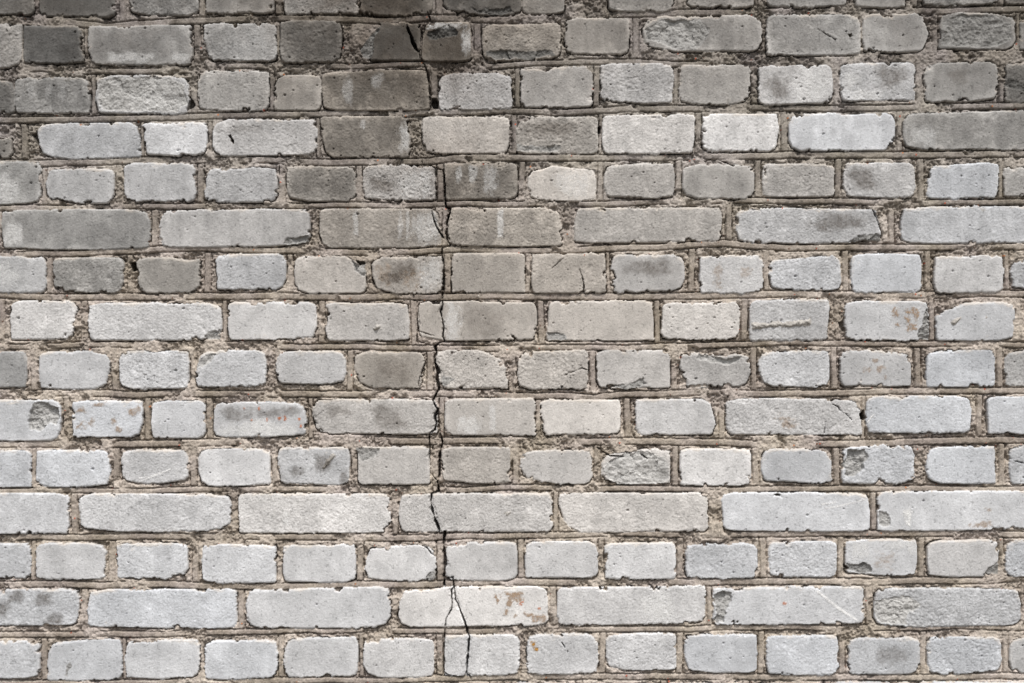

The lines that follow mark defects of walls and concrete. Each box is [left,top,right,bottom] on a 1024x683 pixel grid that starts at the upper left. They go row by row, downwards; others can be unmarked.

crack [407,11,472,680]
corrosion [495,592,546,622]